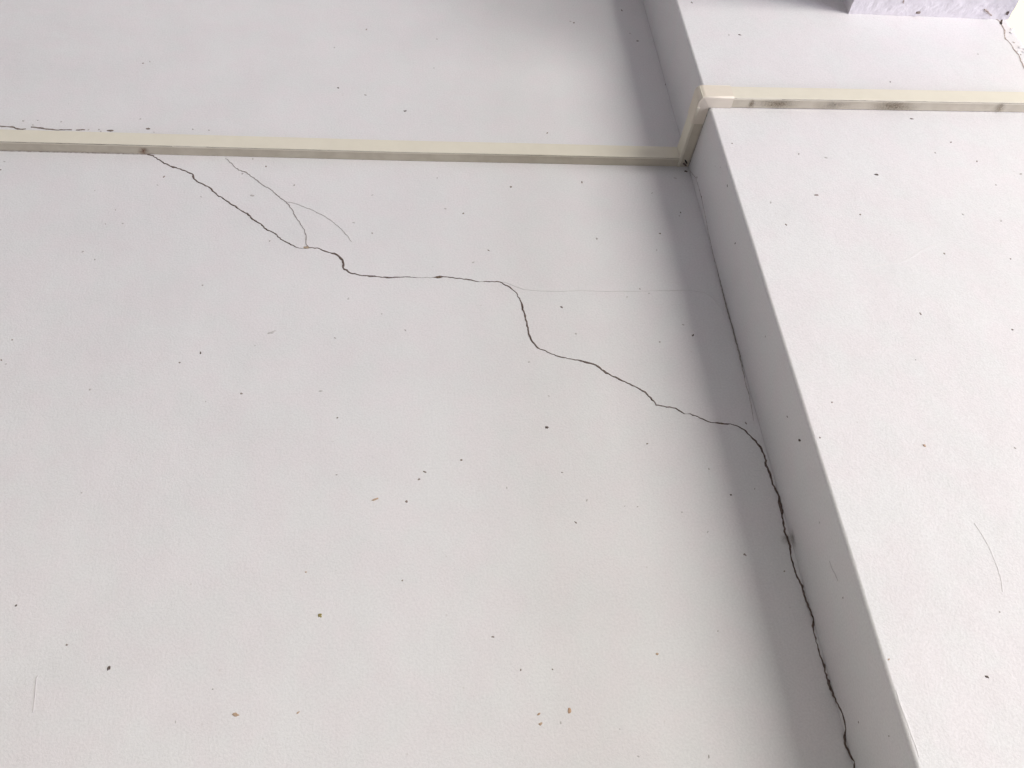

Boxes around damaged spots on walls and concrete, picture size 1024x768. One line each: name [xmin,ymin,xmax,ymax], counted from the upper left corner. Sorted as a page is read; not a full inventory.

crack [0,109,855,768]